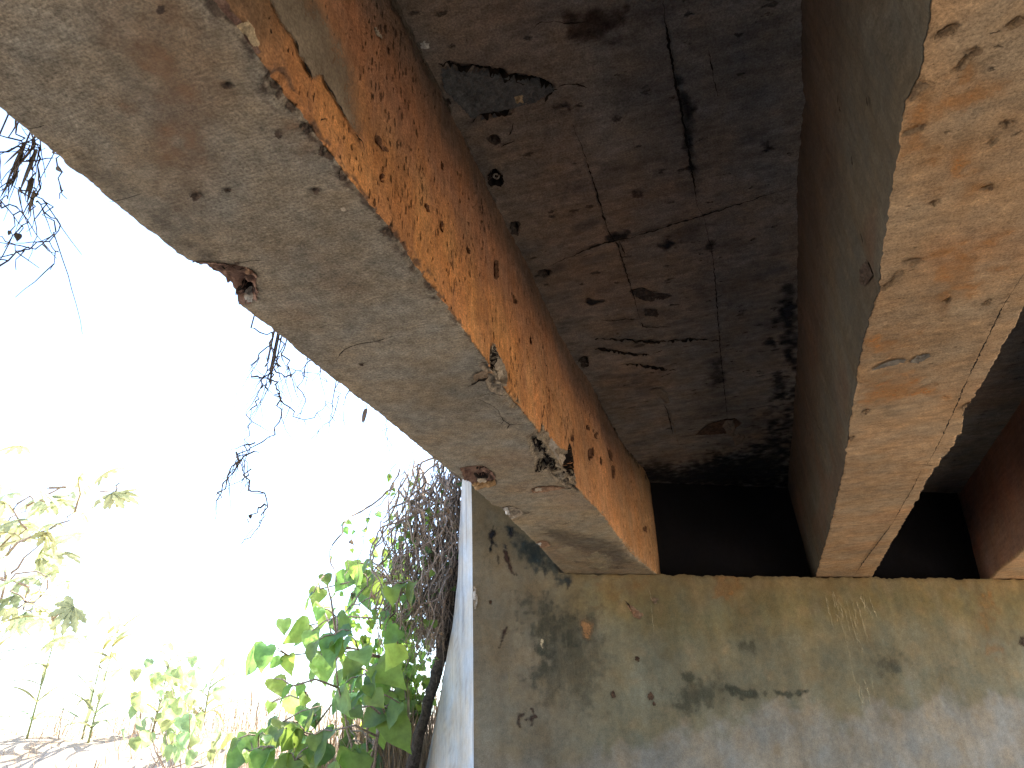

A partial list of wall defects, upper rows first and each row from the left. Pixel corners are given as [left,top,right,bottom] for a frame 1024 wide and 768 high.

crack [547,188,792,268]
spalling [192,261,259,305]
spalling [468,339,508,395]
crack [595,319,718,378]
spalling [460,466,496,490]
spalling [527,405,580,493]
crack [860,276,1023,567]
damp [489,526,570,589]
damp [725,684,757,700]